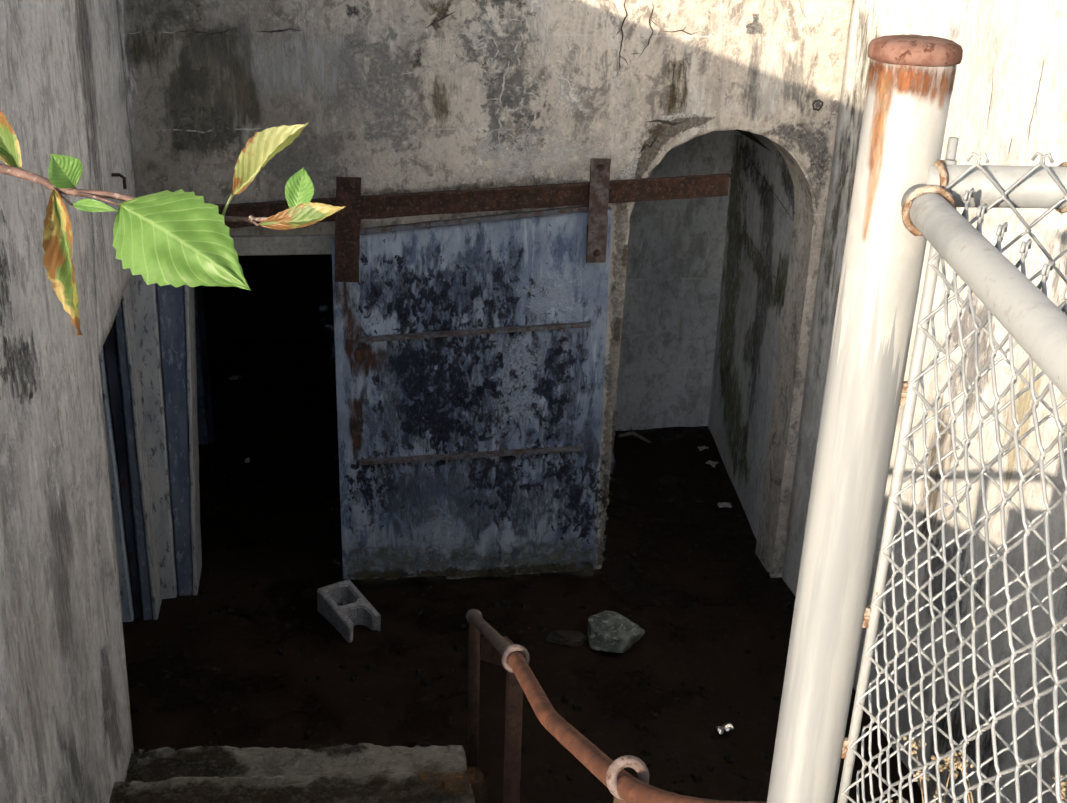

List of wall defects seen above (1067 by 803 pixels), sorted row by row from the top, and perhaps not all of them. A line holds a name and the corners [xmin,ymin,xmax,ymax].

leakage [118,0,201,143]
leakage [165,4,449,153]
crack [615,2,701,78]
rust [864,60,956,238]
leakage [737,39,833,443]